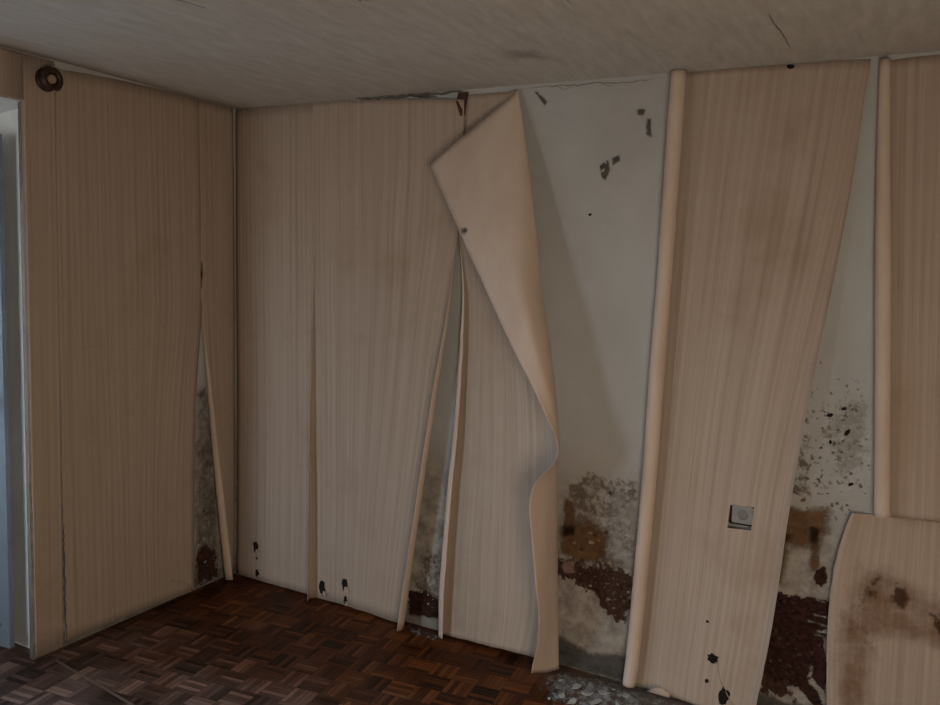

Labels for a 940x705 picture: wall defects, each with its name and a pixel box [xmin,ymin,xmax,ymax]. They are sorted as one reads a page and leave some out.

peeling [792,379,870,520]
water stain [194,482,218,586]
water stain [561,499,606,562]
water stain [760,507,829,705]
water stain [869,578,908,608]